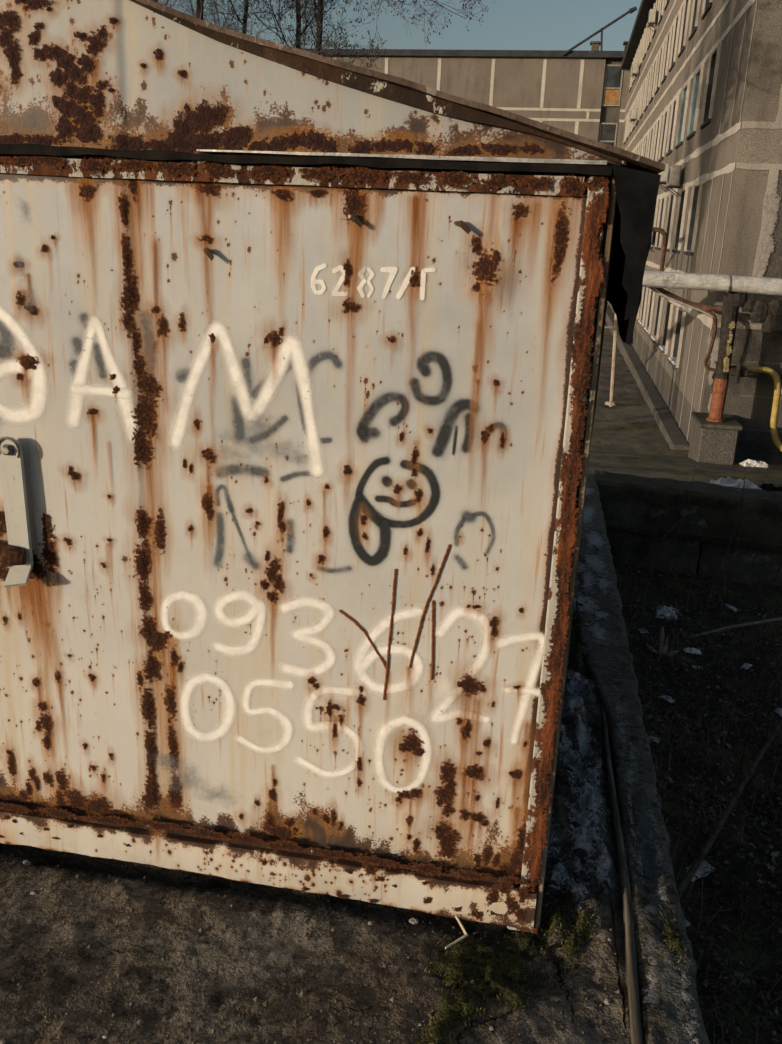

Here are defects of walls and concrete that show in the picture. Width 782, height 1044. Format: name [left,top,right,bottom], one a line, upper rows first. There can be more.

rust [140,48,163,70]
rust [0,94,610,922]
crack [453,962,527,1044]
crack [534,939,575,1024]